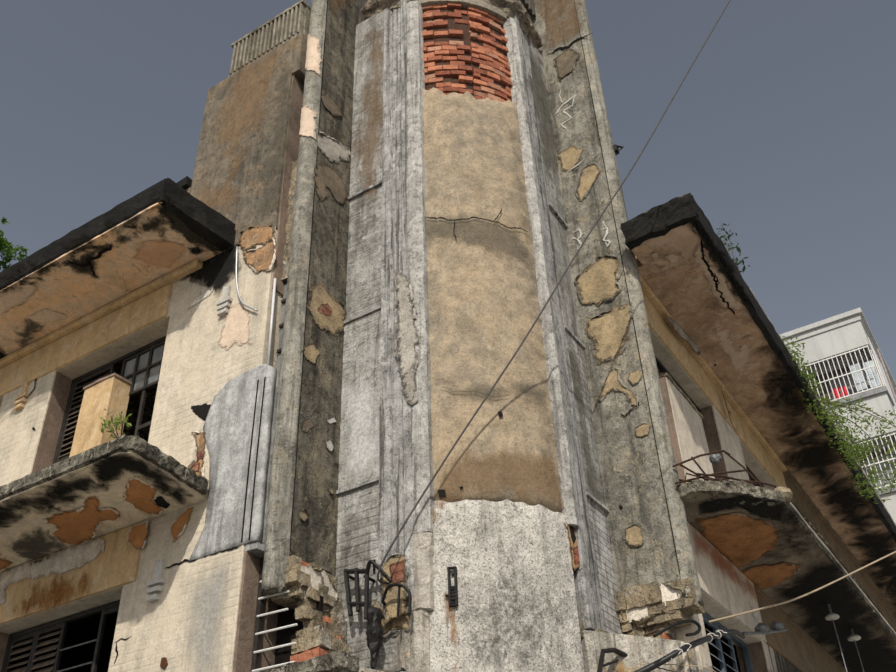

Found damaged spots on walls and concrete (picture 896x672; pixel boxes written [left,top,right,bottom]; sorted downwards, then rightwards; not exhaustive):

peeling [314,132,351,204]
water stain [0,198,238,293]
crack [426,207,528,241]
spalling [574,221,642,407]
crack [701,239,735,315]
water stain [0,454,192,528]
water stain [760,347,896,610]
water stain [12,529,65,564]
peeling [0,496,121,605]
spalling [564,518,582,570]
spalling [620,583,686,639]
water stain [780,564,896,672]